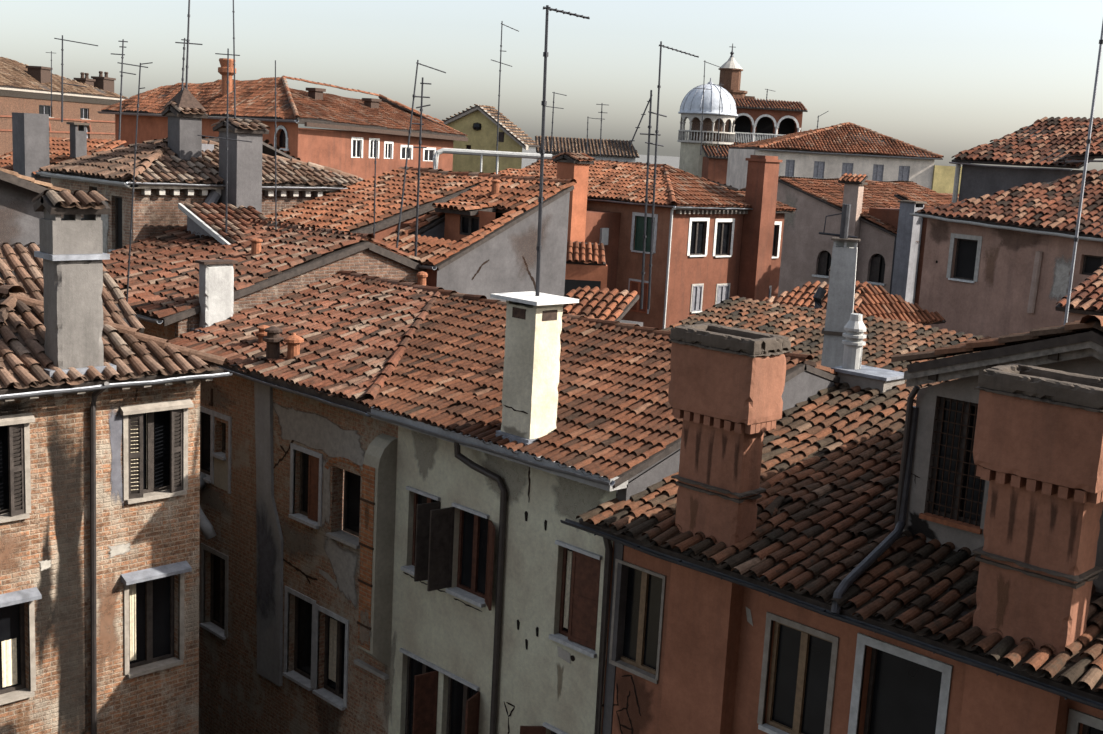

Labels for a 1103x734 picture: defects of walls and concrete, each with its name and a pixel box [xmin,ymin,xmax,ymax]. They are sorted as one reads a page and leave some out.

damp [35,421,88,734]
flaking render [273,403,364,606]
crack [602,675,641,734]